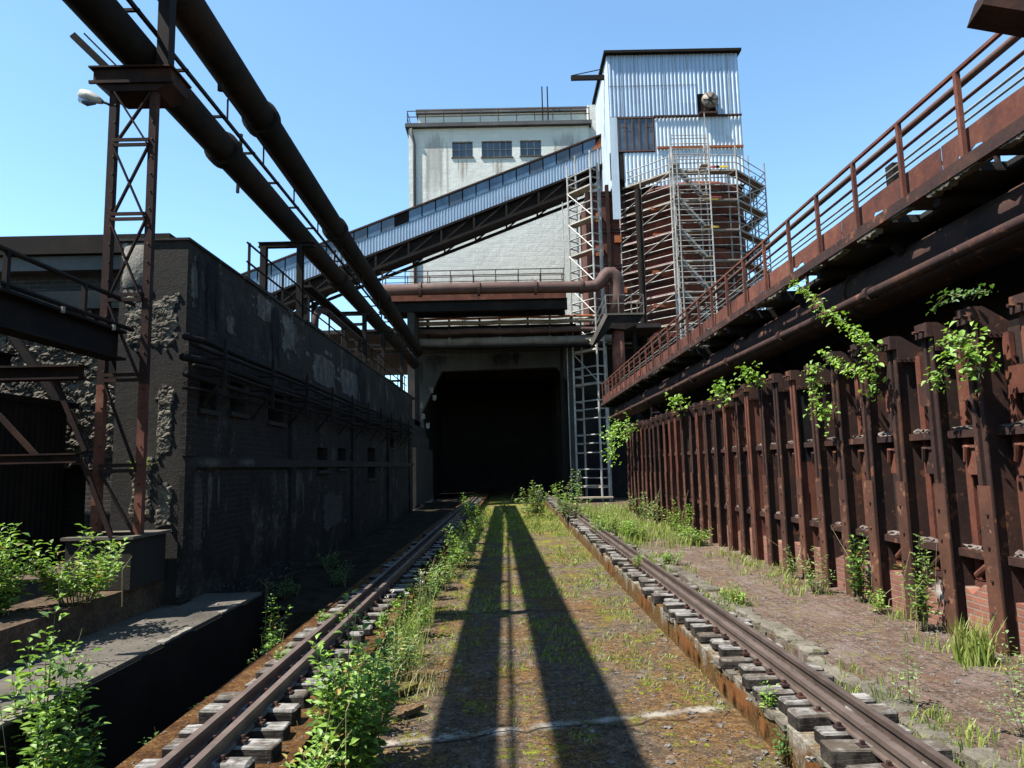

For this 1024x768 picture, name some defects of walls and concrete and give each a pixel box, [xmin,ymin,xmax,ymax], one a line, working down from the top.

spalling [124,293,180,351]
spalling [128,384,175,532]